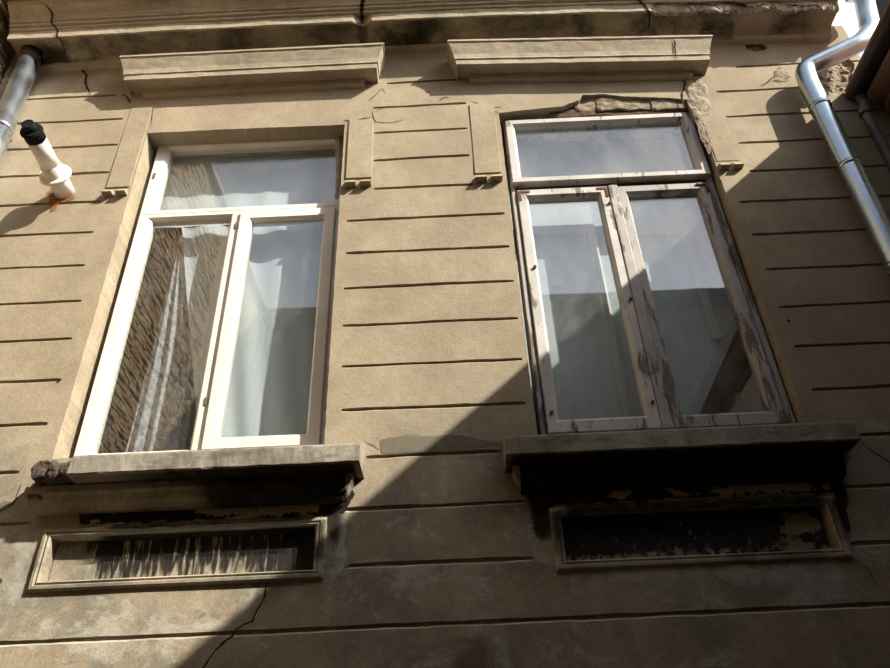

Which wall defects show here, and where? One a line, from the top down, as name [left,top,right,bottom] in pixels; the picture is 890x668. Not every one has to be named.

crack [39,2,66,53]
crack [358,0,366,25]
crack [638,0,651,27]
spalling [652,1,836,17]
crack [78,70,90,96]
crack [680,80,688,110]
spalling [550,76,717,154]
crack [0,484,24,514]
crack [202,567,273,668]